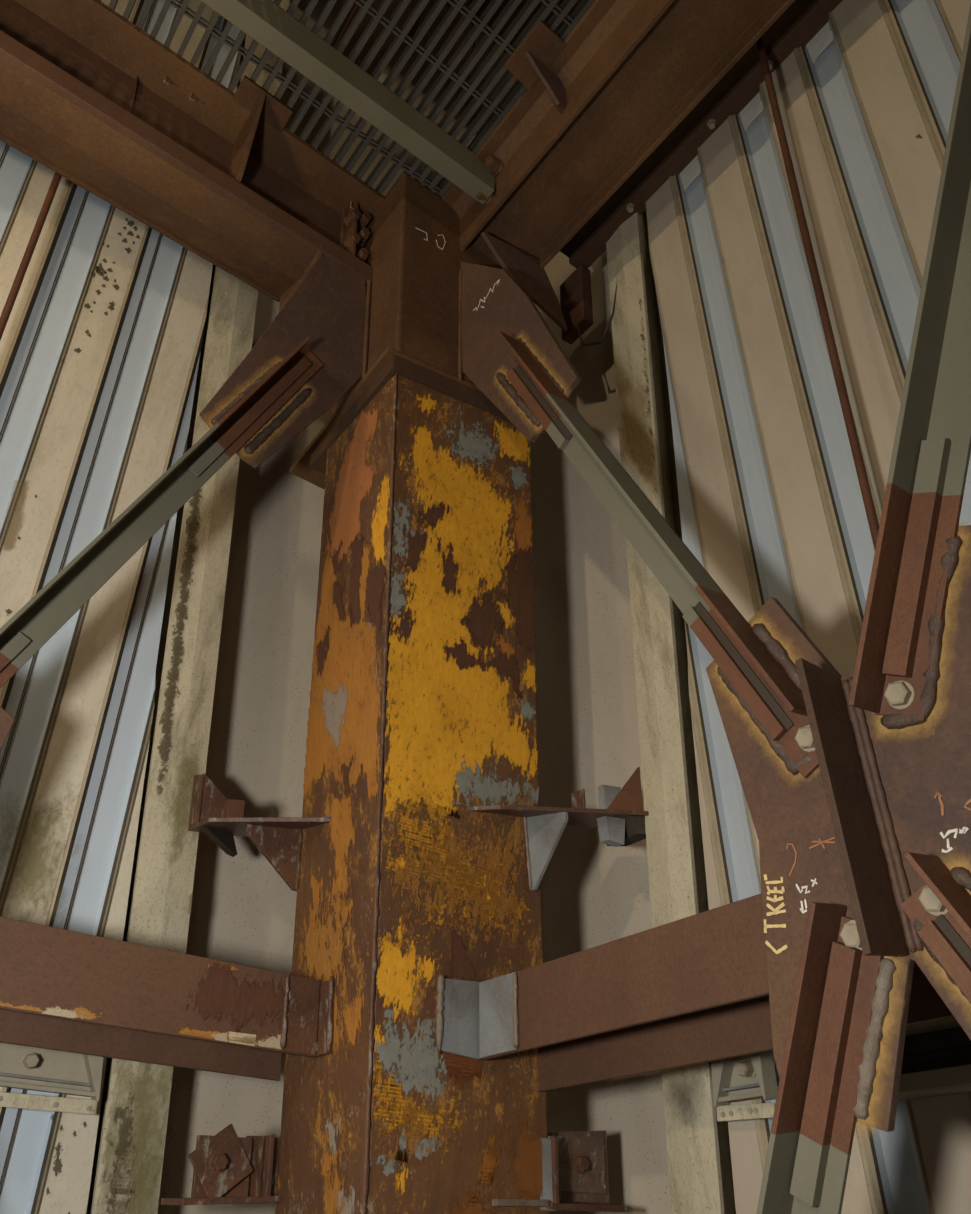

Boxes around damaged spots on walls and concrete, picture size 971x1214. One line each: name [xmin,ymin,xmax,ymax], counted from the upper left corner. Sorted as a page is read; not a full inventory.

leakage [84,218,140,317]
leakage [156,486,203,795]
rust [315,534,418,677]
rust [401,501,536,700]
rust [341,756,354,798]
peeling [293,394,539,1214]
rust [178,962,285,1050]